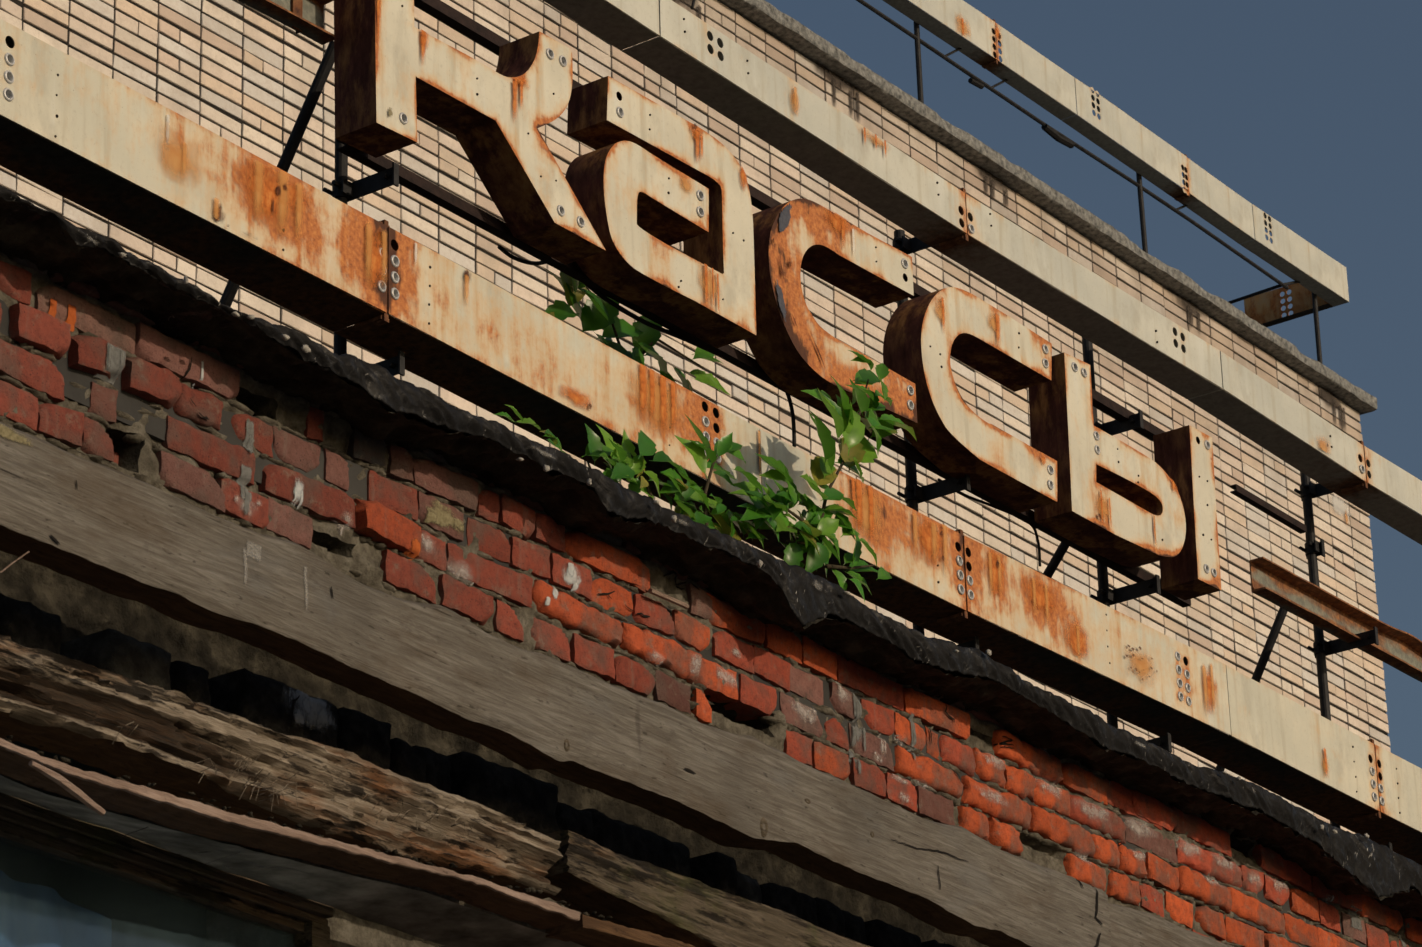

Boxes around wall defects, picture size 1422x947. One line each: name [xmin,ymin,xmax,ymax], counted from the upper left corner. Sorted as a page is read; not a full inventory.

rust [163,142,197,174]
rust [241,160,302,227]
rust [214,198,229,227]
rust [829,211,847,240]
rust [366,224,387,286]
rust [561,388,592,409]
rust [988,551,1005,592]
rust [1066,622,1087,656]